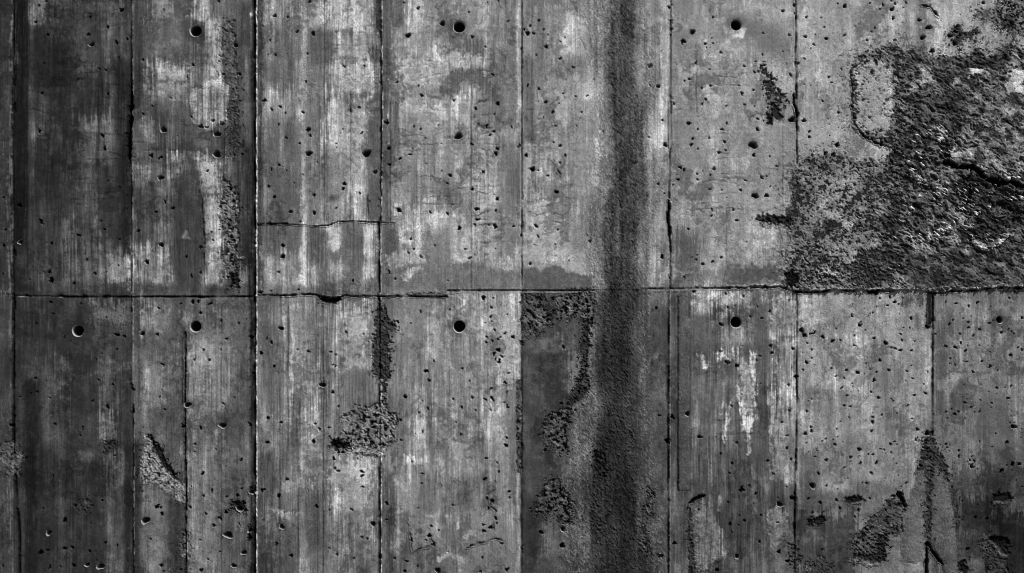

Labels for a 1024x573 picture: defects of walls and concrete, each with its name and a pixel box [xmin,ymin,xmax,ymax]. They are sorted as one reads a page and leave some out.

spalling [751,0,1024,295]
spalling [214,172,246,294]
crack [256,194,396,227]
damp [300,0,709,573]
spalling [327,302,401,460]
spalling [515,286,599,474]
spalling [134,427,196,506]
spalling [529,474,578,532]
spalling [842,485,912,571]